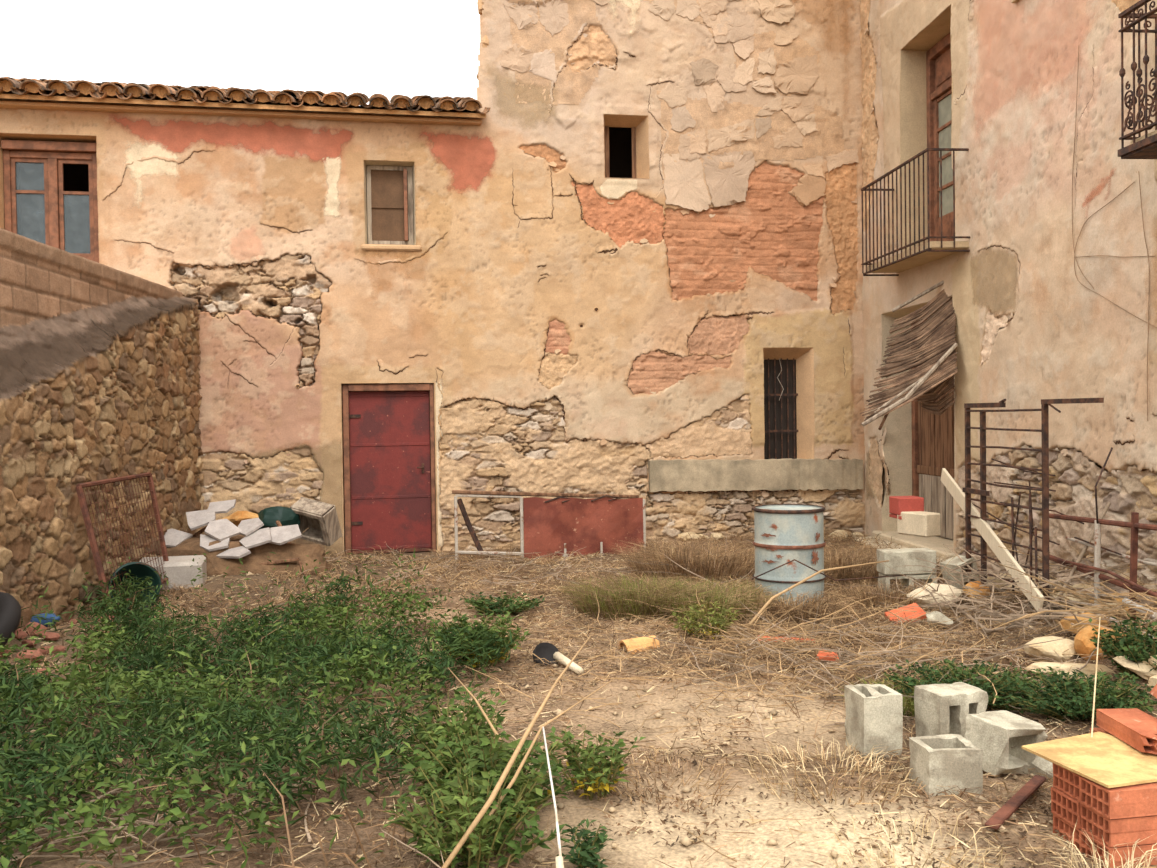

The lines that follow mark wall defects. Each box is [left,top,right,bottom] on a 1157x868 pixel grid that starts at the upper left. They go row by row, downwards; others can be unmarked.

flaking render [1111,0,1139,12]
peeling [500,0,617,106]
crack [100,146,217,200]
flaking render [519,144,566,173]
flaking render [571,0,879,315]
crack [354,230,448,265]
flaking render [170,254,332,388]
flaking render [439,315,889,552]
crack [1113,406,1157,473]
flaking render [198,446,324,520]
flaking render [954,445,1157,611]